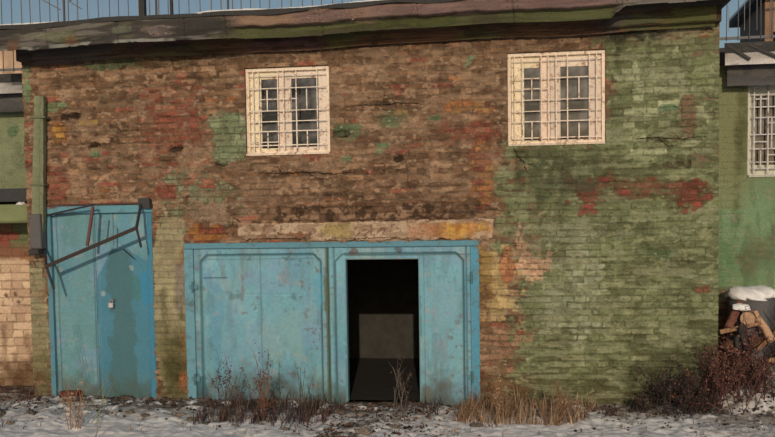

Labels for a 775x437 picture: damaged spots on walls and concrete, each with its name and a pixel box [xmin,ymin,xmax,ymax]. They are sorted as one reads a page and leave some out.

crack [358,102,423,111]
crack [636,136,707,146]
crack [259,166,354,180]
peeling [548,171,713,216]